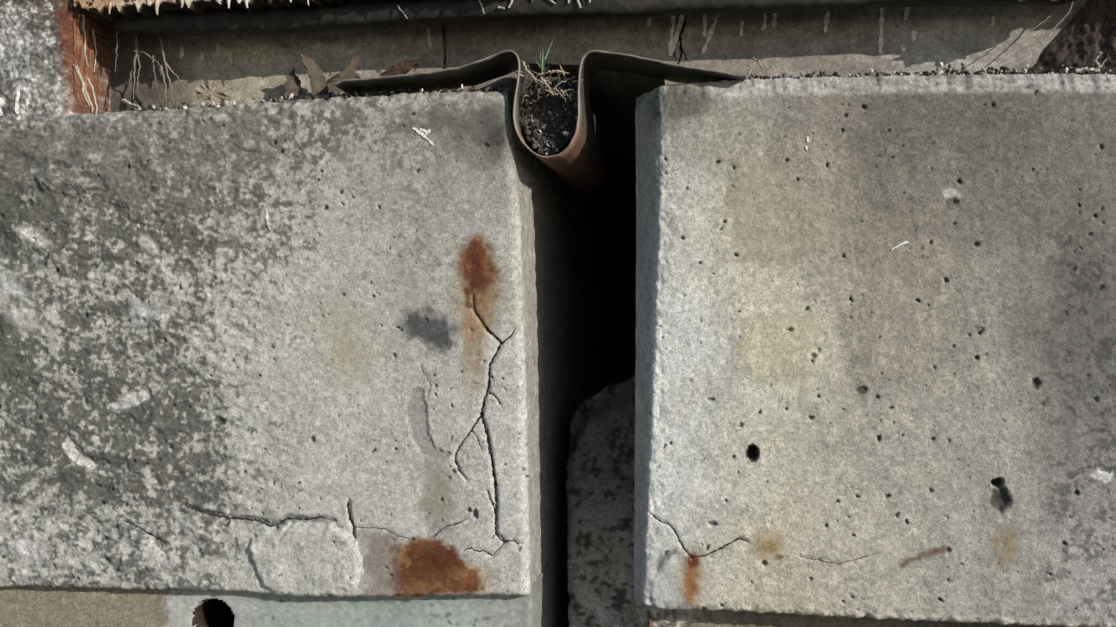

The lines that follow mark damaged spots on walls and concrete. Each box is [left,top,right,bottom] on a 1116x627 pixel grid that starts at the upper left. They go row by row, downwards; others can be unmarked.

peeling [74,0,250,15]
corrosion [54,3,104,110]
corrosion [459,235,498,348]
crack [185,295,520,556]
corrosion [364,534,484,598]
corrosion [684,554,700,604]
crack [651,514,745,557]